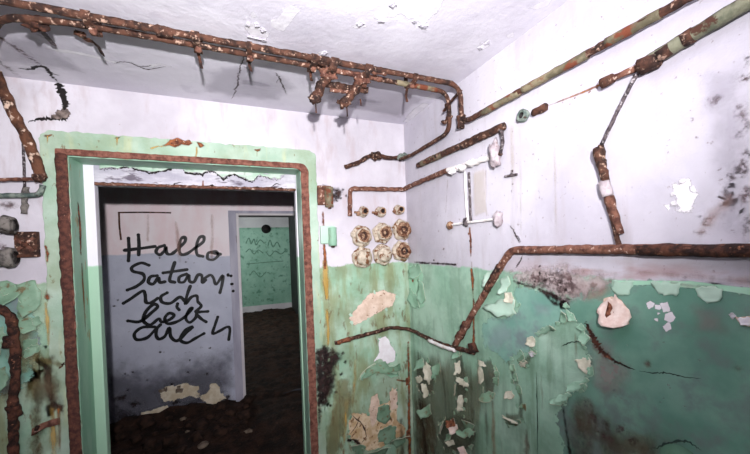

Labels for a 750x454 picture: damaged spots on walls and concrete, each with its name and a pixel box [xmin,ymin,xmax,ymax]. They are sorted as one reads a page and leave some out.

crack [19,65,69,123]
crack [231,57,250,99]
rust [150,138,204,156]
peeling [349,264,426,325]
mould [513,265,611,305]
peeling [0,280,43,396]
flaking render [141,383,226,415]
peeling [347,387,410,454]
peeling [413,358,441,419]
peeling [437,351,476,454]
crack [584,321,635,370]
peeling [478,270,750,454]